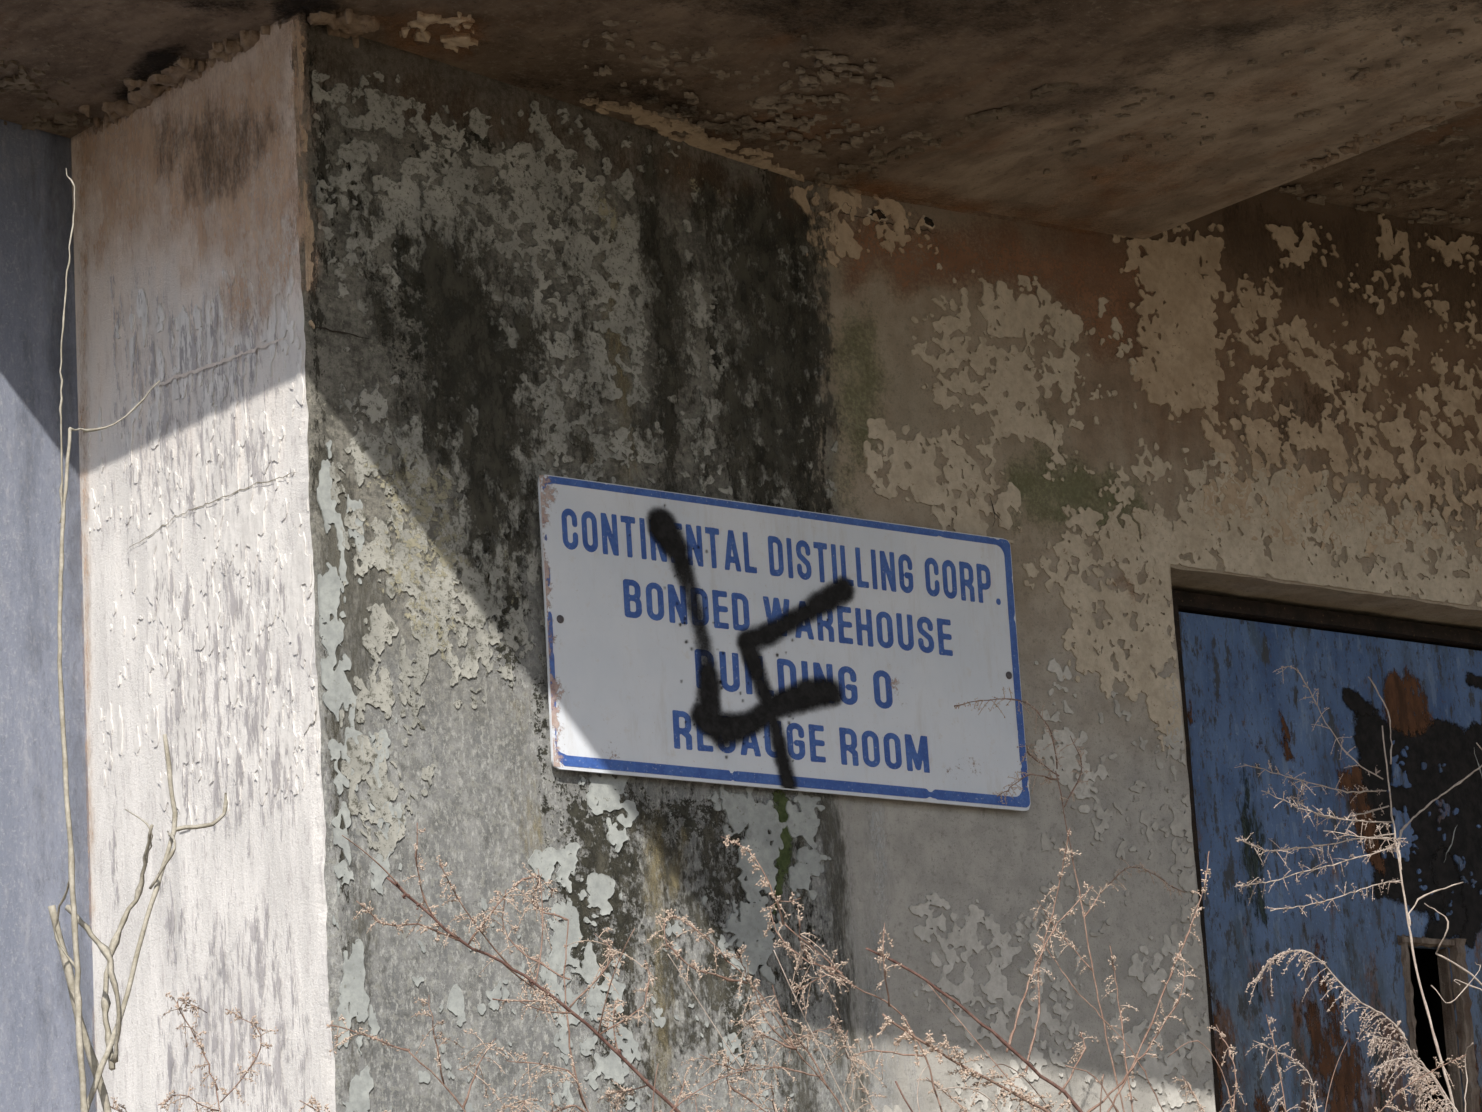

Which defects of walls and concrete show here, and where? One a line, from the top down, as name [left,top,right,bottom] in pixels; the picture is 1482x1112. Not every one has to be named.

water stain [160,105,273,196]
peeling [79,8,942,928]
water stain [271,0,1146,1112]
peeling [863,213,1482,1112]
corrosion [1279,709,1295,762]
corrosion [1336,765,1386,875]
corrosion [1382,665,1434,737]
peeling [336,939,392,1112]
peeling [418,1044,472,1084]
peeling [651,784,831,1112]
corrosion [1254,1088,1290,1112]
corrosion [1292,935,1371,1112]